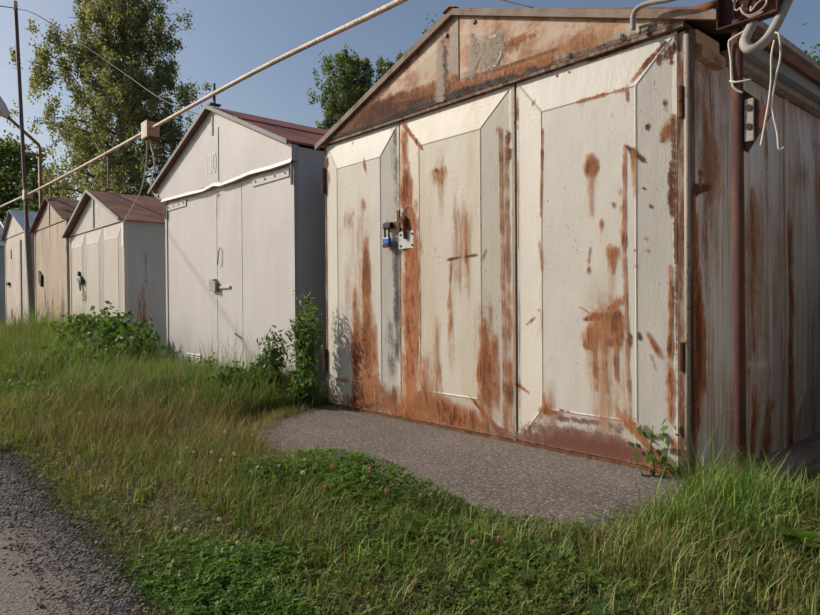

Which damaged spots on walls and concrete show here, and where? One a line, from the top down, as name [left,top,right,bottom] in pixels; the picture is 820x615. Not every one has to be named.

corrosion [327,29,608,439]
corrosion [576,85,628,103]
corrosion [579,99,677,473]
corrosion [692,64,721,454]